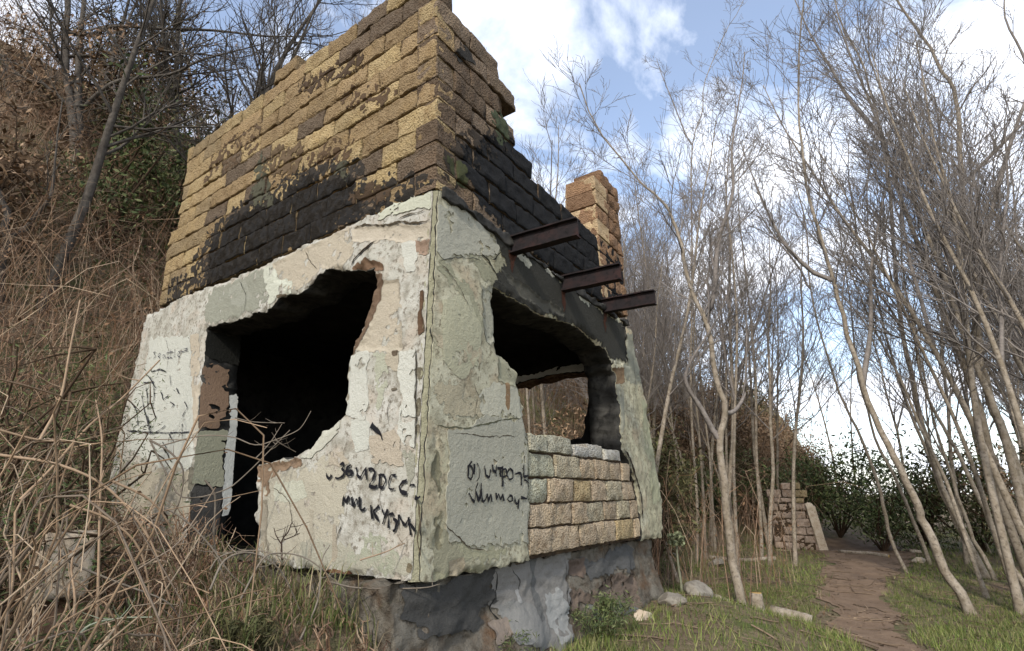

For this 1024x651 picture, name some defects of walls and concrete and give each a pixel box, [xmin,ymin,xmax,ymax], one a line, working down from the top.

spalling [298,48,398,113]
spalling [204,120,263,183]
damp [261,141,311,179]
spalling [307,138,354,167]
damp [348,181,391,205]
damp [204,266,292,324]
peeling [129,334,238,516]